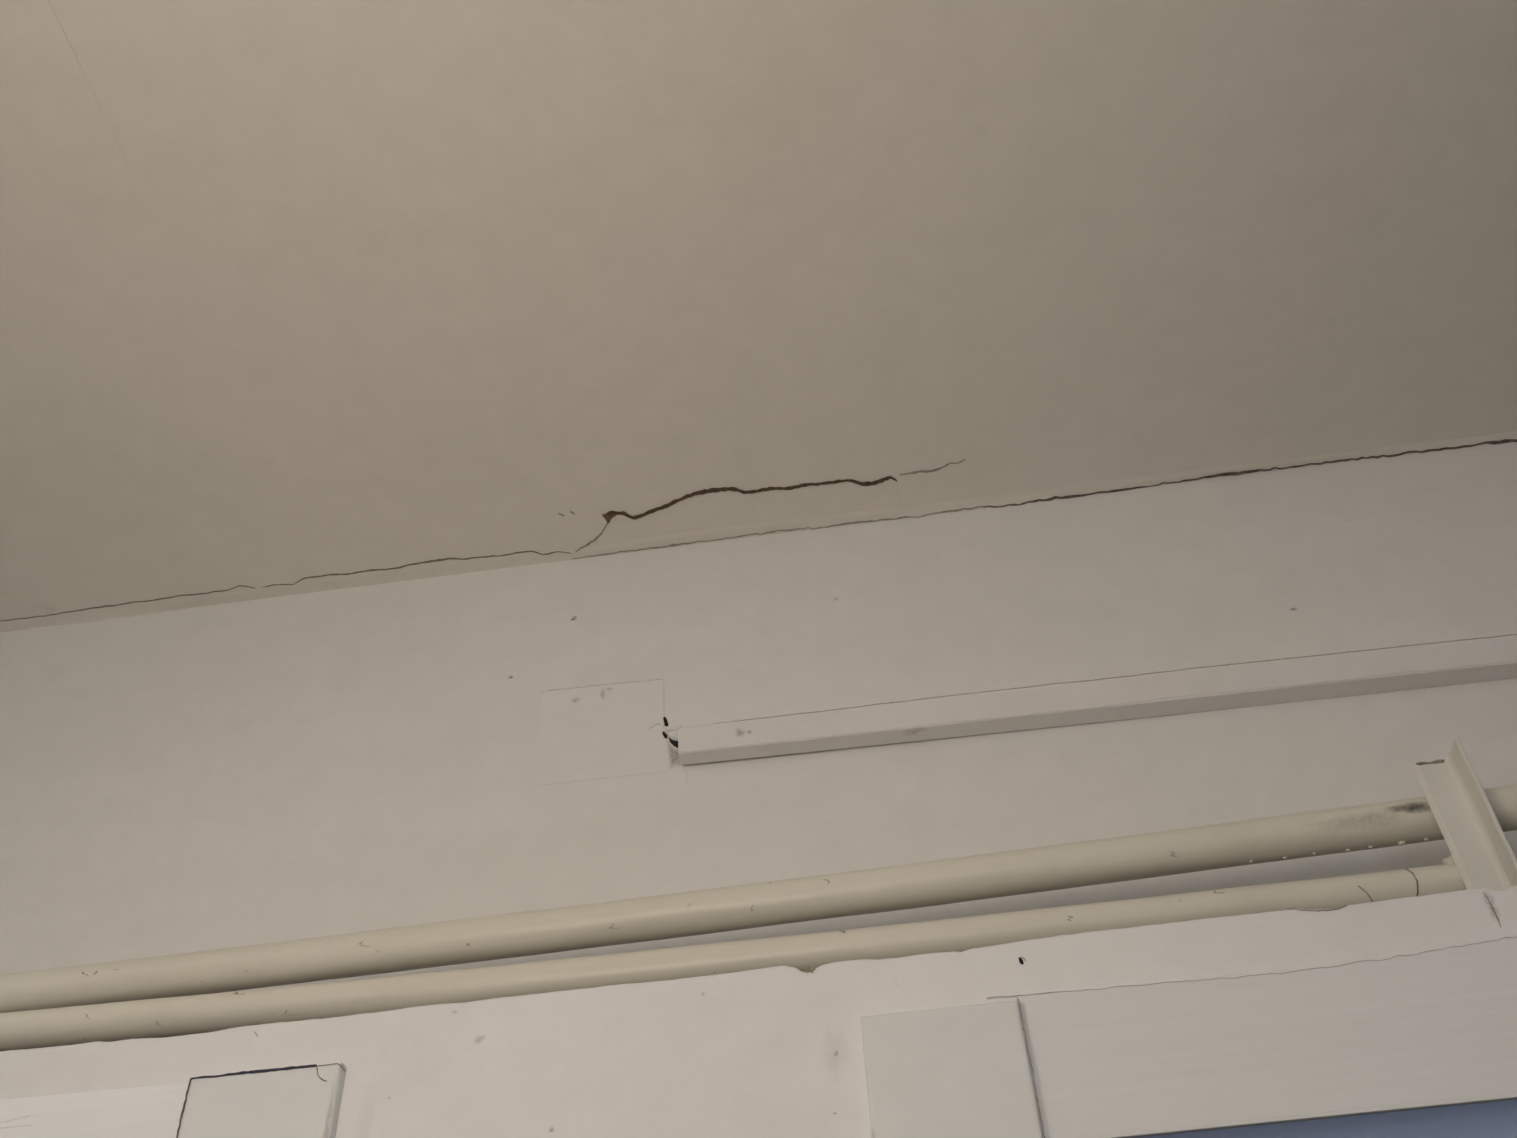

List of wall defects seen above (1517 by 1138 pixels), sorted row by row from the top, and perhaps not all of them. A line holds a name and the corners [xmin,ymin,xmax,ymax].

crack [1,439,1517,621]